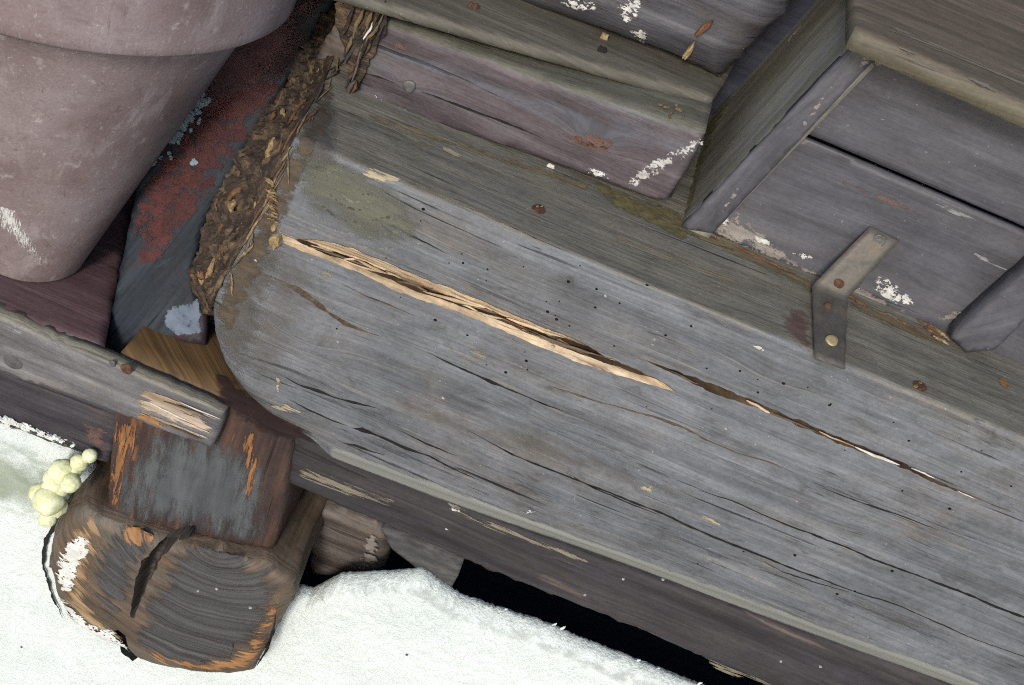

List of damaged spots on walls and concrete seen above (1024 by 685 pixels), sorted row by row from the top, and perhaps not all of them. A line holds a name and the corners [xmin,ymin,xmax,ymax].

crack [260,275,378,336]
crack [391,226,444,253]
crack [282,234,1010,512]
crack [110,525,195,661]